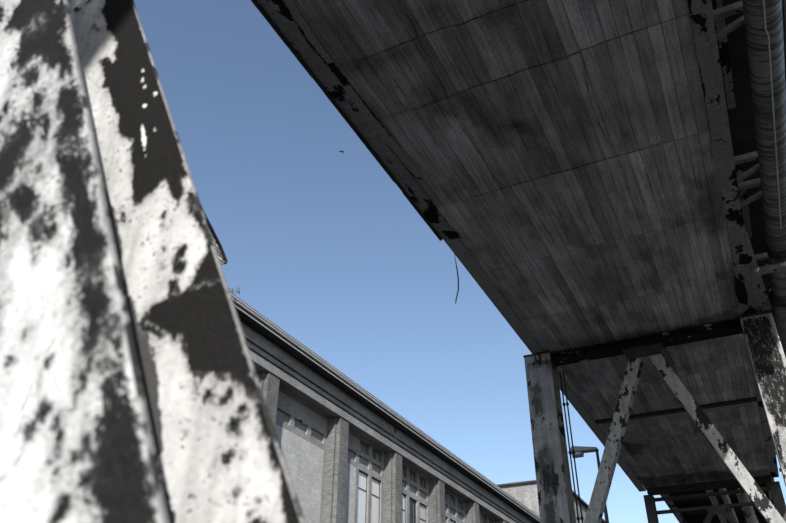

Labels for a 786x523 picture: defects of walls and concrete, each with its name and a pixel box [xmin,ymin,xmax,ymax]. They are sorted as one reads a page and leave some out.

peeling [102,177,176,523]